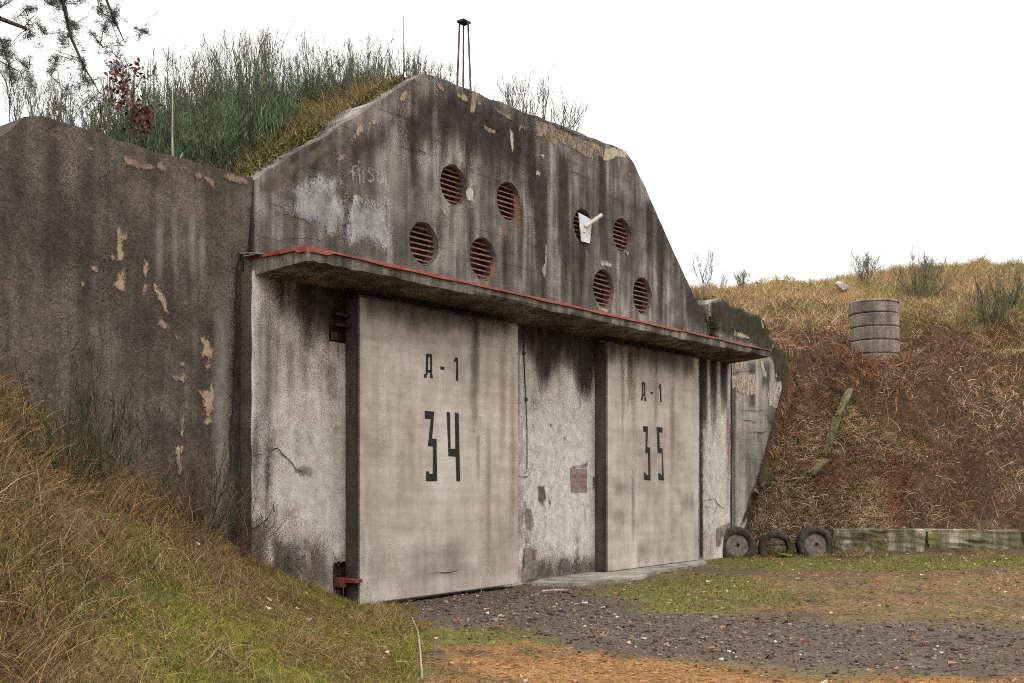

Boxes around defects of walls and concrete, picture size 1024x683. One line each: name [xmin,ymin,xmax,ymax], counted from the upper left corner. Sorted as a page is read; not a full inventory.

peeling [497,104,627,162]
peeling [111,227,127,291]
peeling [179,166,248,188]
water stain [559,157,584,296]
water stain [598,144,607,255]
water stain [646,204,663,308]
peeling [142,260,178,339]
peeling [200,336,213,368]
crack [227,181,327,493]
peeling [169,417,185,475]
peeling [198,382,215,424]
water stain [369,295,728,558]